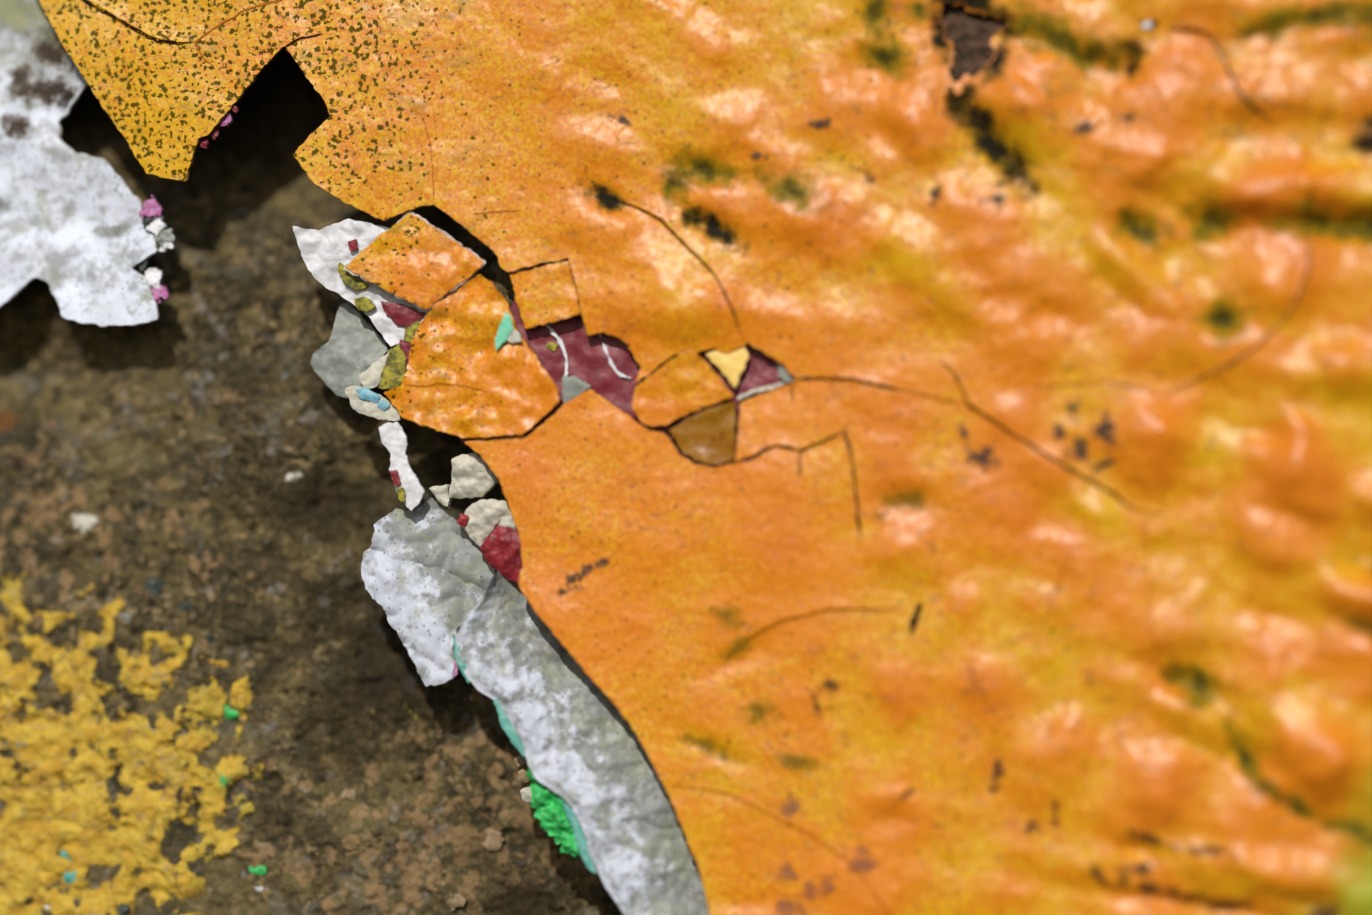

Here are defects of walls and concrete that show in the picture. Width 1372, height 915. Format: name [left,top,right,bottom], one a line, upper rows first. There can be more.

spalling [941,4,1007,82]
crack [1166,27,1273,125]
crack [620,201,744,341]
spalling [0,0,794,915]
crack [732,423,861,538]
crack [790,360,1166,667]
damp [1090,862,1251,912]
damp [1127,828,1236,859]
damp [1224,721,1372,915]